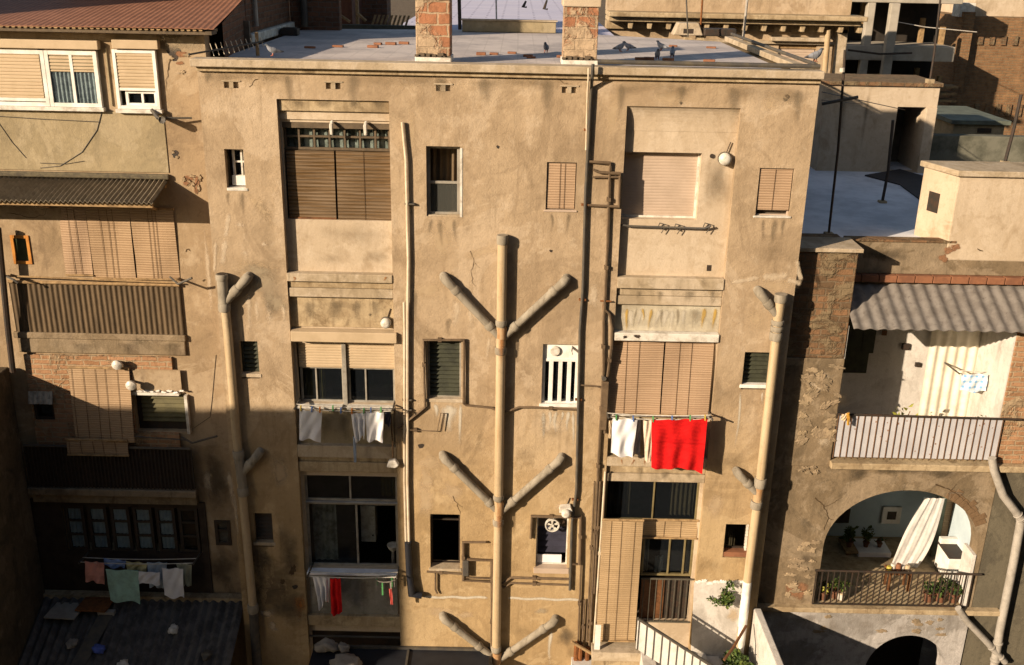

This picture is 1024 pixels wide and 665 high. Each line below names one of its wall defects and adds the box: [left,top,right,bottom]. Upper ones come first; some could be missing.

spalling [182,174,202,194]
flaking render [795,364,846,445]
spalling [784,540,822,599]